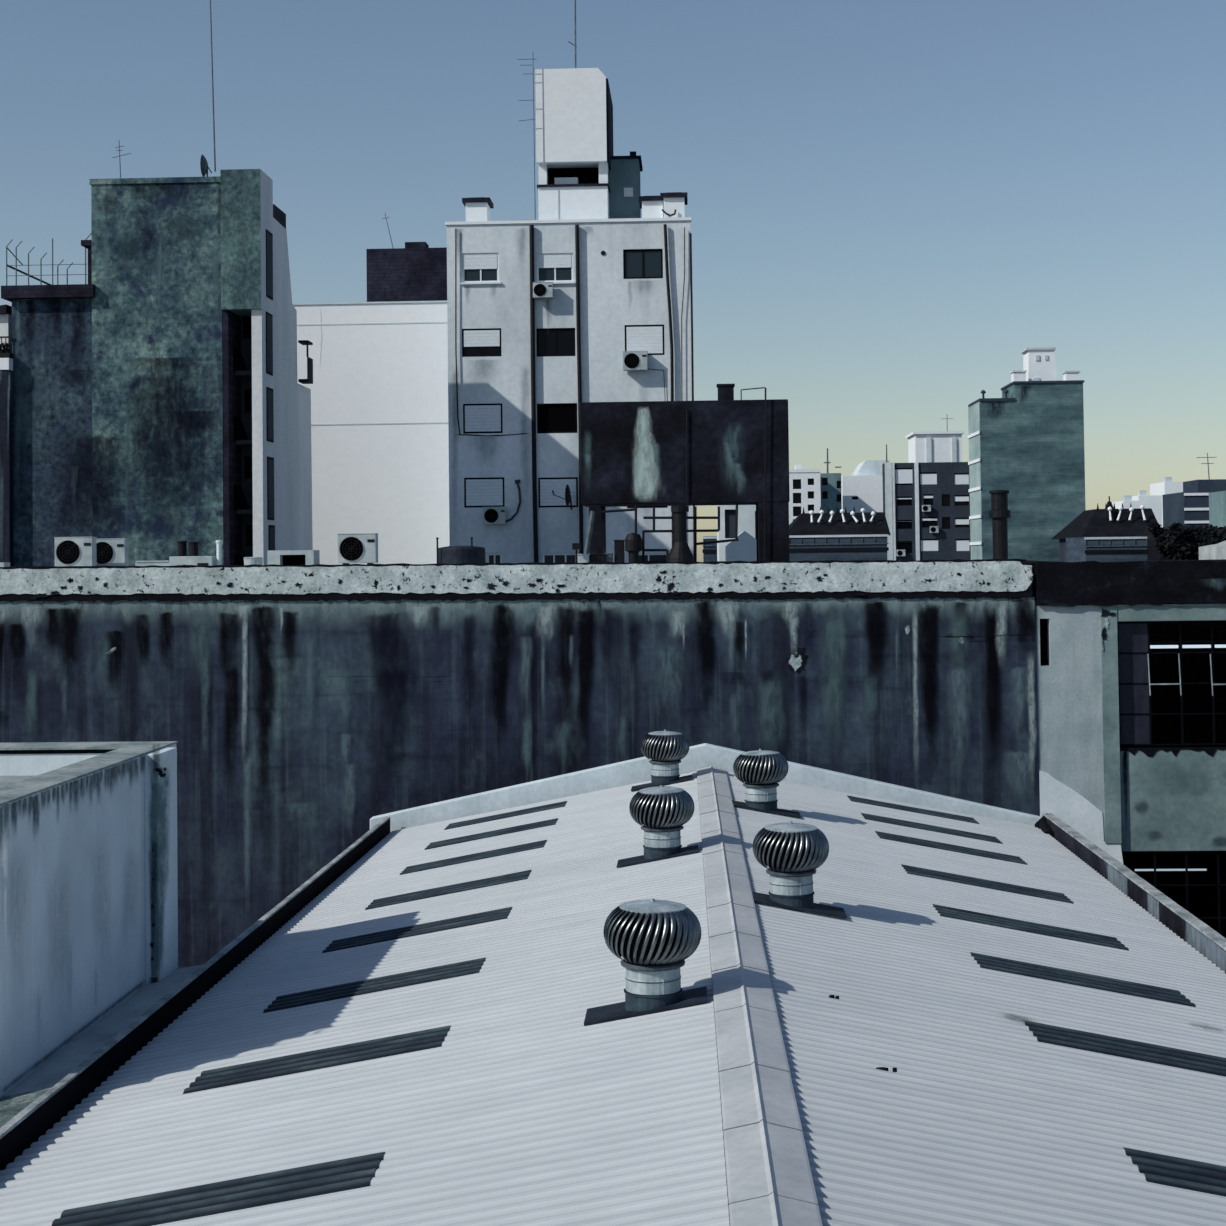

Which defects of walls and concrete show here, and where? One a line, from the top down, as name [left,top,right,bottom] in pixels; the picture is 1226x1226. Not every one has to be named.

damp [73,358,209,506]
damp [0,597,1035,790]
damp [0,745,170,1090]